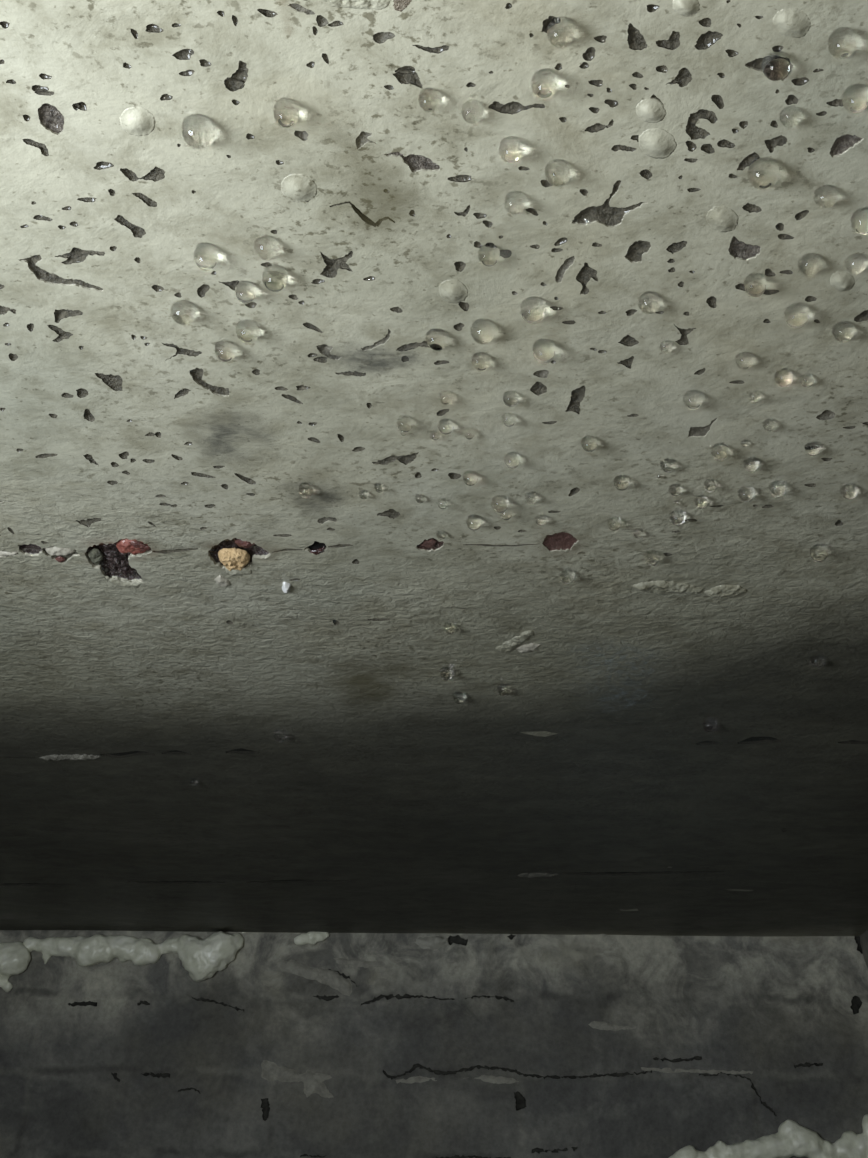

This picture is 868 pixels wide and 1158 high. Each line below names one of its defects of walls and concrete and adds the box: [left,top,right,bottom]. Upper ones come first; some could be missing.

spalling [288,3,316,15]
spalling [42,538,152,588]
spalling [208,538,271,587]
corrosion [542,532,578,552]
crack [382,1064,652,1084]
crack [699,1072,777,1116]